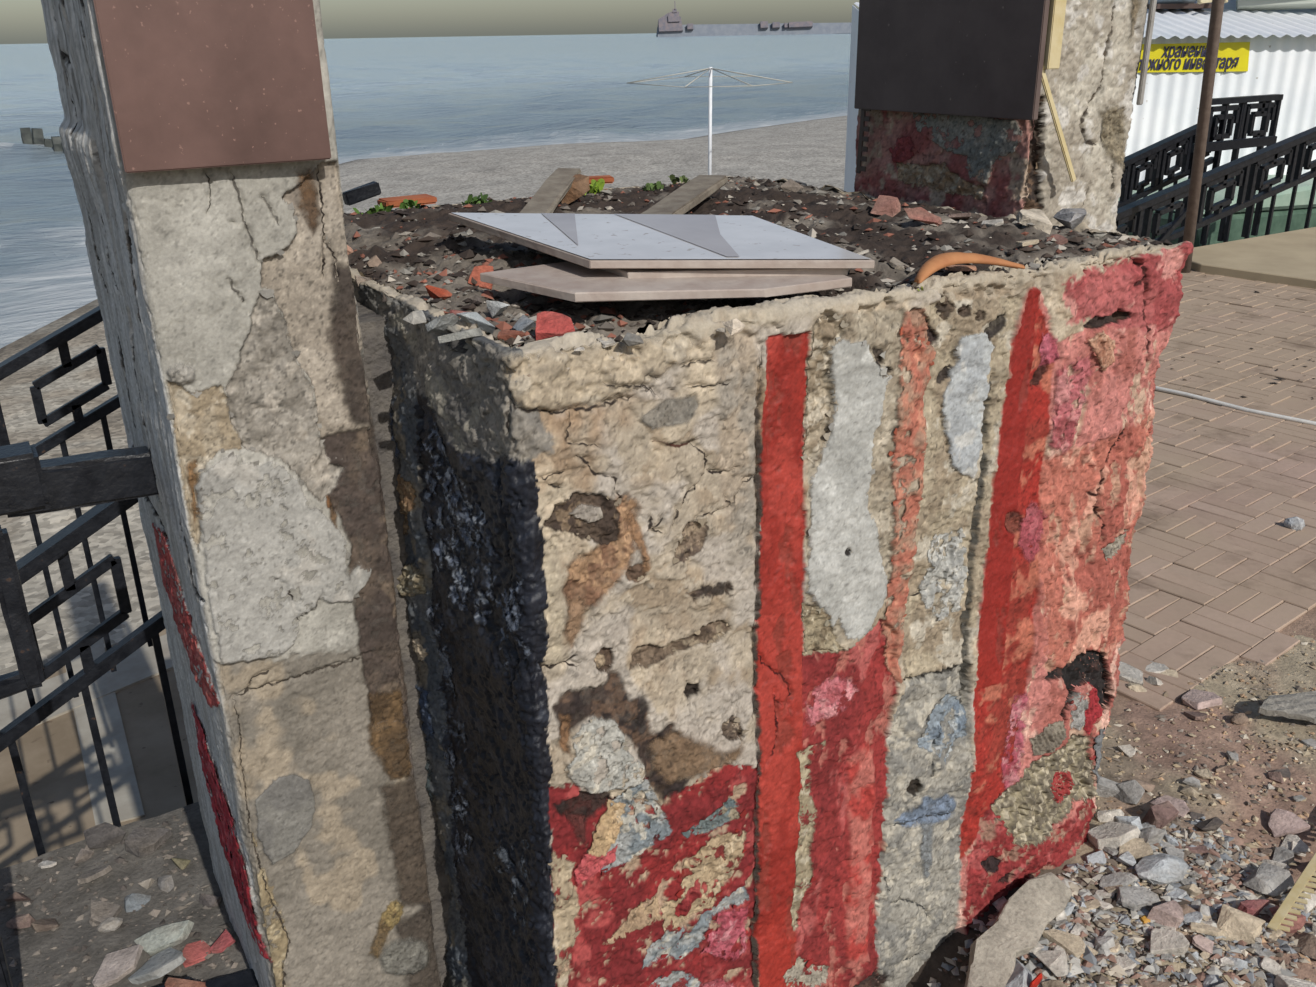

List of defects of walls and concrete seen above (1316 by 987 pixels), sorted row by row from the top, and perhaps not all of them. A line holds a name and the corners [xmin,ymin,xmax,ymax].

peeling [889,97,1045,210]
crack [1080,5,1115,206]
crack [205,173,279,262]
crack [316,165,339,278]
peeling [167,161,372,664]
spalling [544,492,622,545]
spalling [626,564,646,582]
spalling [672,518,709,566]
crack [1088,419,1126,541]
spalling [629,620,731,669]
peeling [152,523,288,987]
spalling [990,650,1110,848]